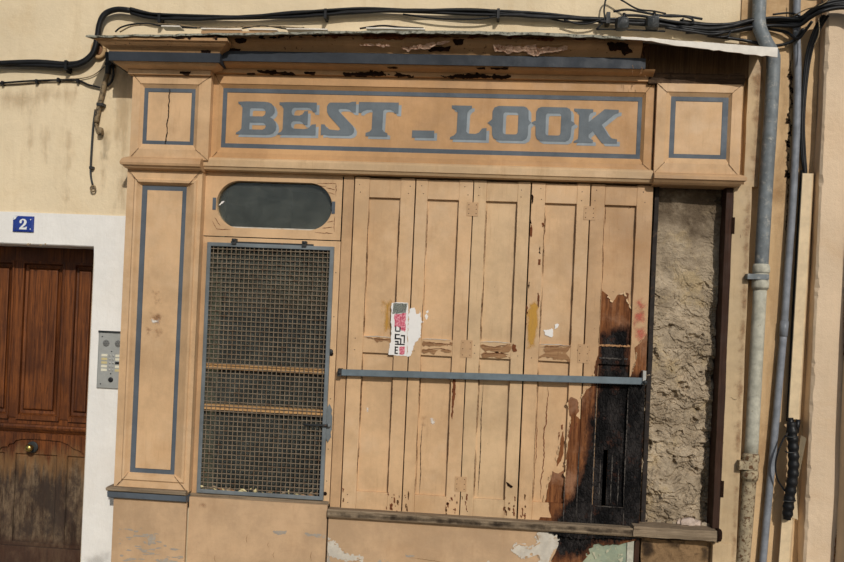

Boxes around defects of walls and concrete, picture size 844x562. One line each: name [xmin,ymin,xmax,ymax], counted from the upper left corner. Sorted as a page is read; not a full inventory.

peeling [312,34,488,52]
peeling [493,35,568,56]
spalling [607,42,633,56]
spalling [343,67,414,78]
spalling [441,67,511,80]
crack [163,89,171,144]
peeling [422,338,453,355]
peeling [480,341,517,359]
peeling [539,344,571,362]
peeling [536,392,552,502]
peeling [304,533,364,562]
peeling [511,532,560,562]